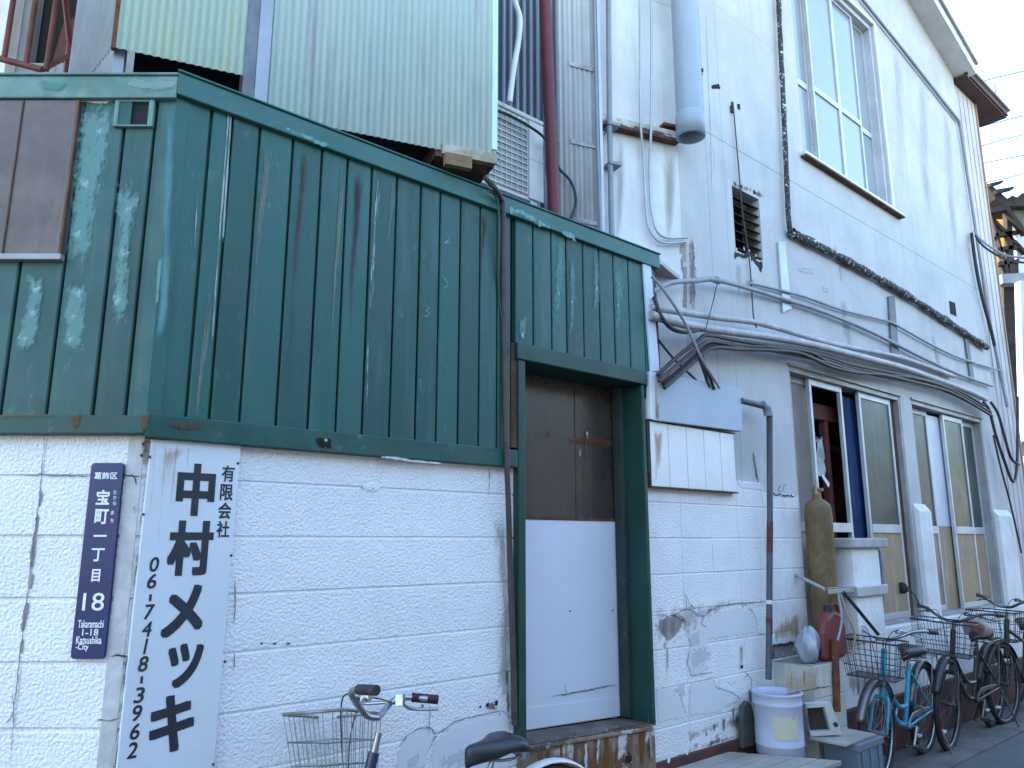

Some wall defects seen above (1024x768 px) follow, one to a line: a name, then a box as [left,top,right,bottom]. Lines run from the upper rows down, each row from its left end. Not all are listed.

peeling [70,101,112,260]
peeling [113,185,139,320]
rust [295,156,307,267]
rust [332,180,362,322]
peeling [17,275,42,349]
peeling [63,285,87,348]
crack [4,438,86,743]
peeling [428,700,511,768]
crack [555,682,615,696]
rust [538,722,645,768]
peeling [648,607,755,725]